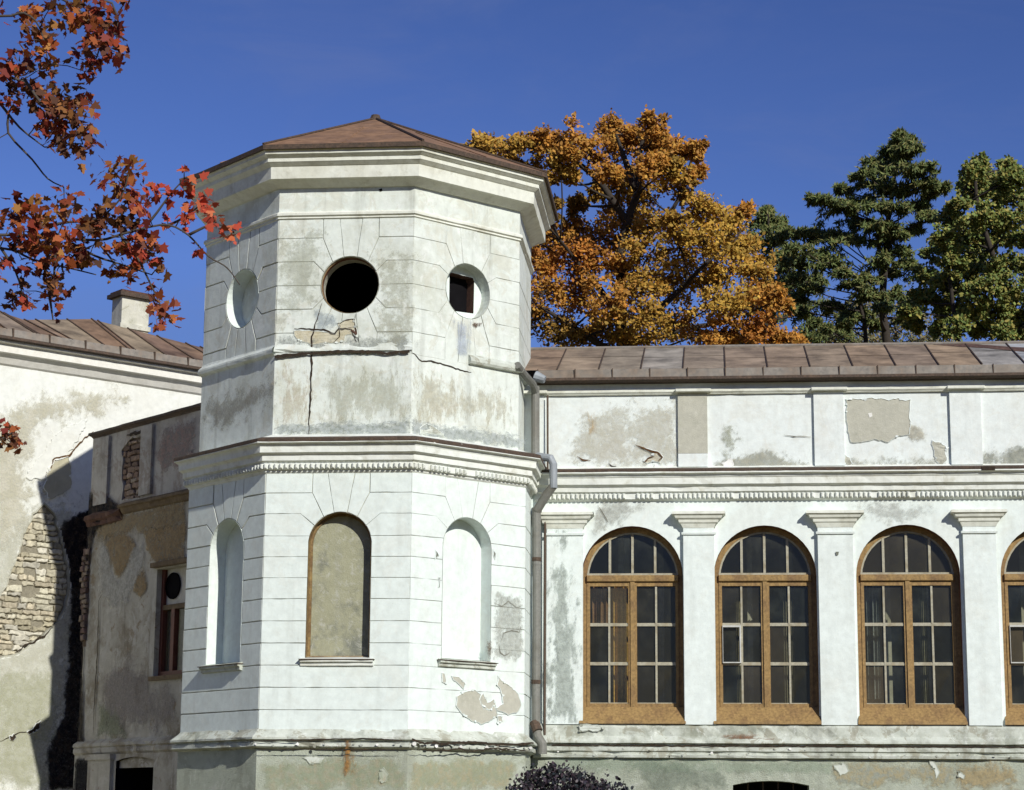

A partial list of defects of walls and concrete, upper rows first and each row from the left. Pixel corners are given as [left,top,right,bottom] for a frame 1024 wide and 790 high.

spalling [294,318,358,345]
crack [294,304,359,434]
crack [413,353,468,372]
peeling [845,397,911,443]
flaking render [122,438,141,500]
crack [636,445,663,462]
spalling [931,440,949,464]
flaking render [0,457,91,659]
leakage [546,564,579,722]
peeling [441,672,521,725]